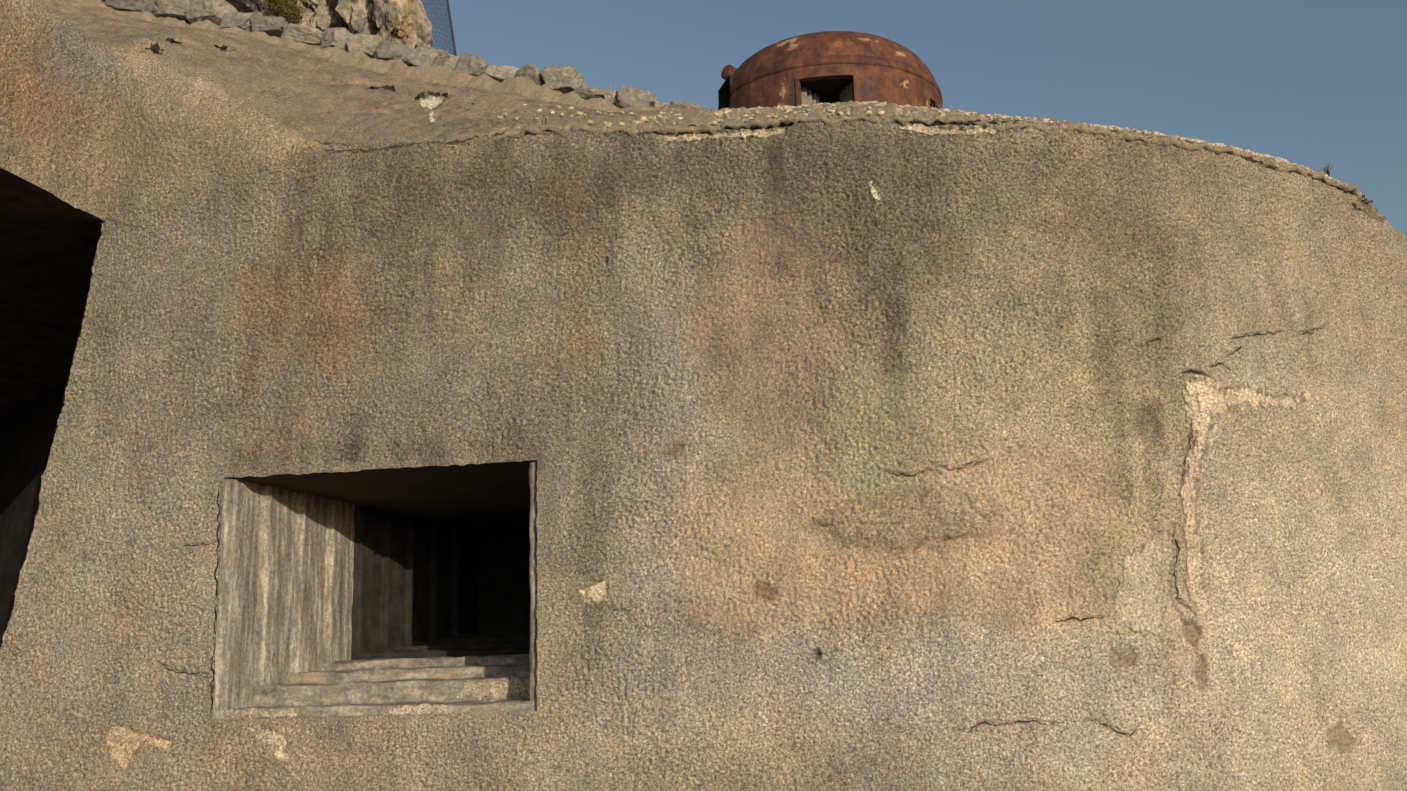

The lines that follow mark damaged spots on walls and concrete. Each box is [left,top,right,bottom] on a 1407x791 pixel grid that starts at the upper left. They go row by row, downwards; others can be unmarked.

spalling [419,96,445,122]
crack [324,85,564,152]
crack [676,123,785,136]
crack [925,119,1069,128]
crack [1241,155,1373,204]
crack [1181,325,1325,482]
crack [883,459,991,501]
flaking render [1176,375,1310,688]
crack [1166,532,1196,614]
spalling [105,724,175,769]
crack [954,718,1139,736]